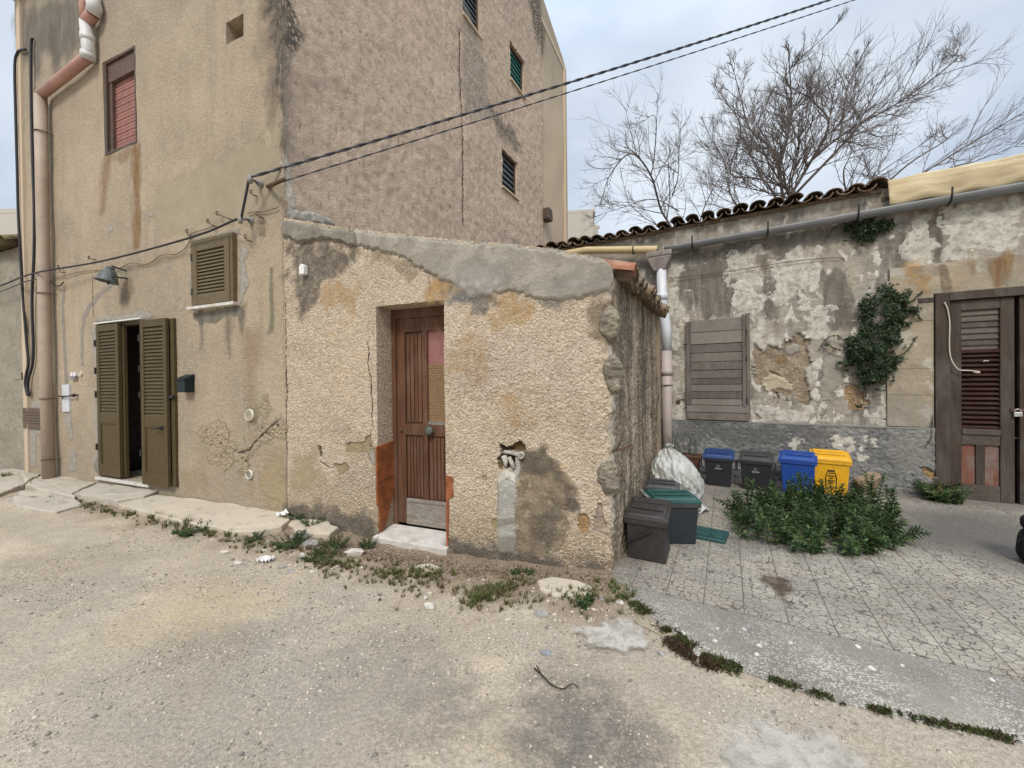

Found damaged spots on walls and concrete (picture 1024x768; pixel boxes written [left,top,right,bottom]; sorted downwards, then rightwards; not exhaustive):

crack [457,30,465,214]
peeling [889,194,1024,262]
leakage [285,241,354,312]
peeling [723,244,839,424]
flaking render [198,395,288,474]
crack [235,298,288,454]
flaking render [334,436,375,478]
spalling [498,441,525,480]
flaking render [834,377,887,426]
leakage [445,447,579,567]